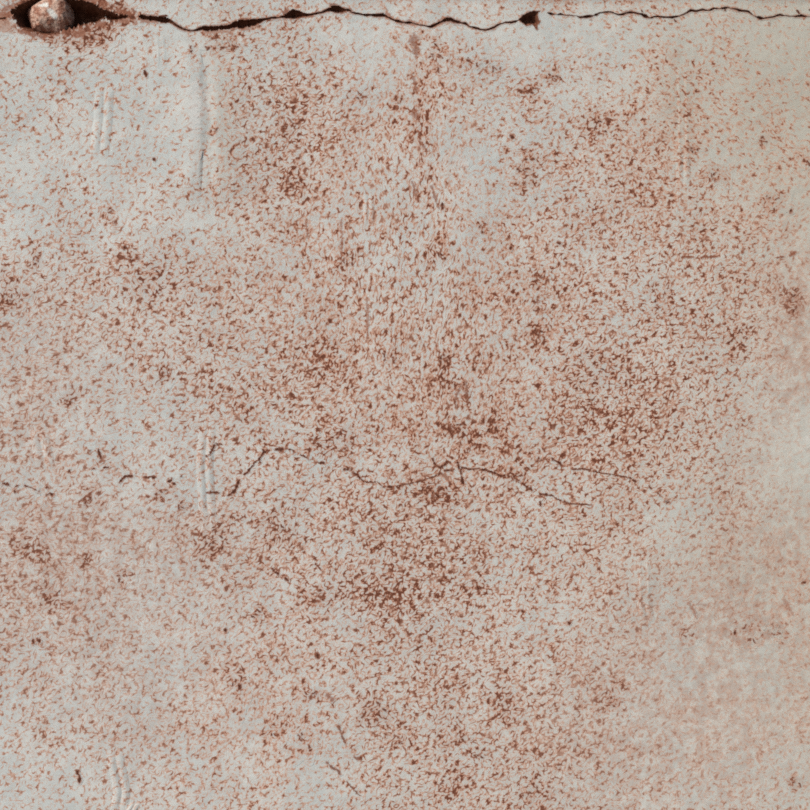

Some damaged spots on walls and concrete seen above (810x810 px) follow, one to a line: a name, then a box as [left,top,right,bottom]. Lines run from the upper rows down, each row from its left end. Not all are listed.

hole [0,0,153,57]
crack [138,2,518,37]
crack [547,5,810,26]
rust [387,6,567,277]
rust [290,193,403,400]
rust [433,334,507,464]
crack [66,448,184,487]
crack [205,441,592,508]
crack [533,455,672,506]
rust [139,474,311,575]
rust [290,566,432,626]
rust [221,651,333,766]